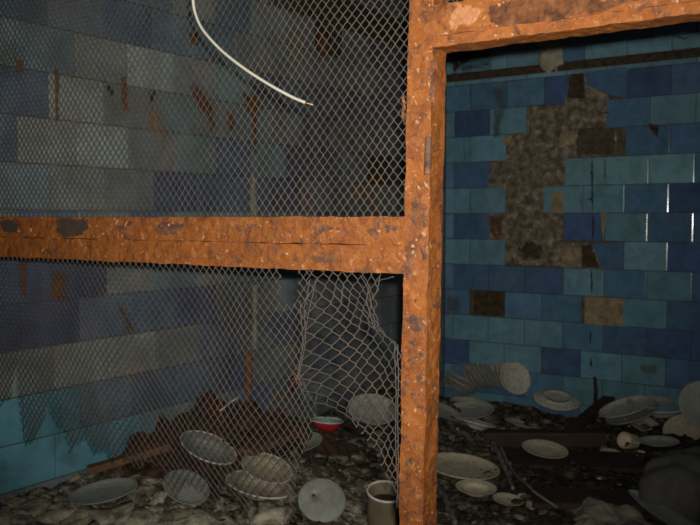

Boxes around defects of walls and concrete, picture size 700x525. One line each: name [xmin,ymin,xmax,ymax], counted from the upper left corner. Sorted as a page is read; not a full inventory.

flaking render [446,48,700,269]
crack [581,158,605,239]
peeling [473,290,505,317]
peeling [584,296,627,327]